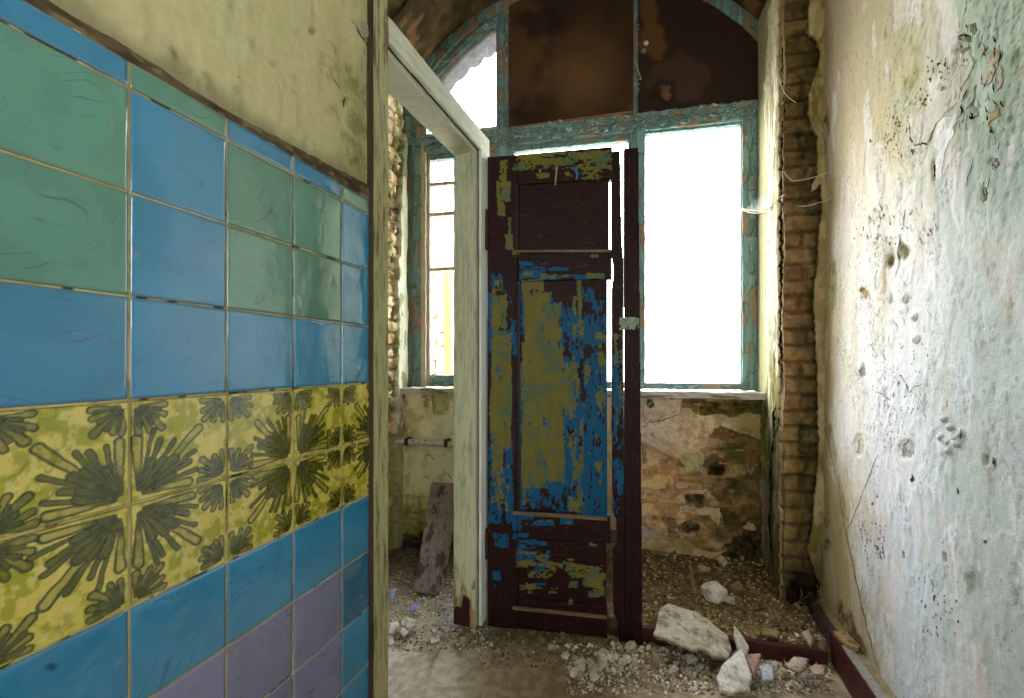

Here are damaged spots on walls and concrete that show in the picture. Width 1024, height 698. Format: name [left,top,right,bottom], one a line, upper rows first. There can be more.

peeling [441,10,758,144]
flaking render [869,23,1004,180]
flaking render [640,0,829,604]